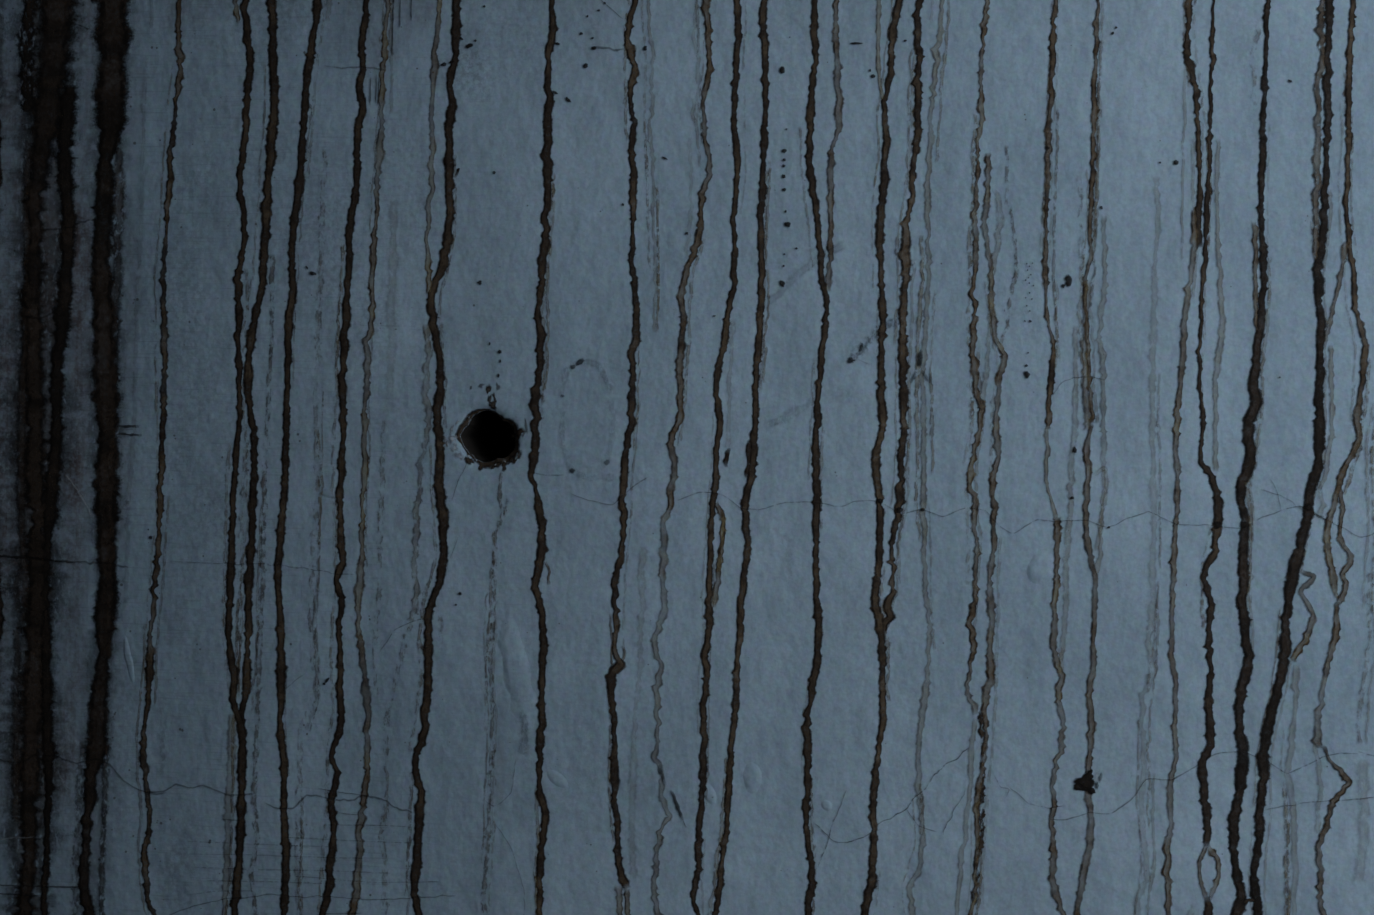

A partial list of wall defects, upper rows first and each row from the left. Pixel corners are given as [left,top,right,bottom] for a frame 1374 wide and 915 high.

rust [222,0,392,915]
rust [405,0,463,915]
spalling [455,386,525,471]
rust [528,0,559,915]
rust [605,0,715,915]
rust [690,0,771,915]
rust [801,0,844,915]
rust [861,0,950,915]
rust [964,0,1018,915]
rust [1138,0,1374,915]